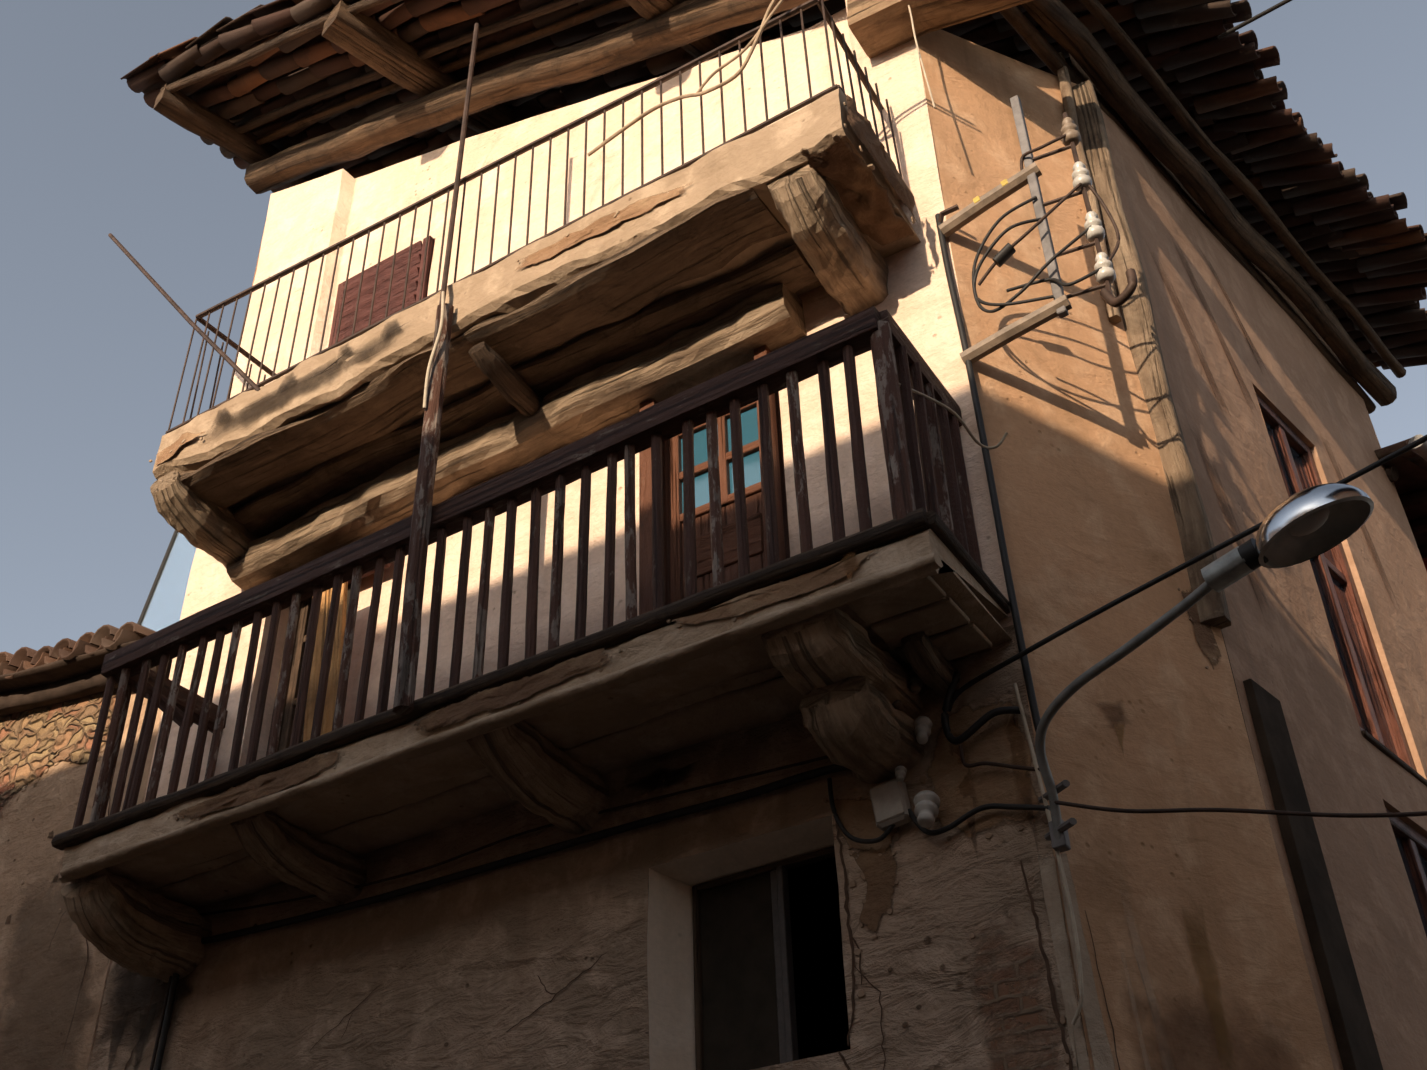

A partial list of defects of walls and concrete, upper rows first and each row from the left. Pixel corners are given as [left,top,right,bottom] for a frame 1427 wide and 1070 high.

leakage [382,321,400,338]
leakage [214,409,229,424]
spalling [823,797,901,939]
leakage [105,964,190,1070]
crack [506,952,607,1032]
crack [835,821,886,1070]
peeling [1020,854,1120,1070]